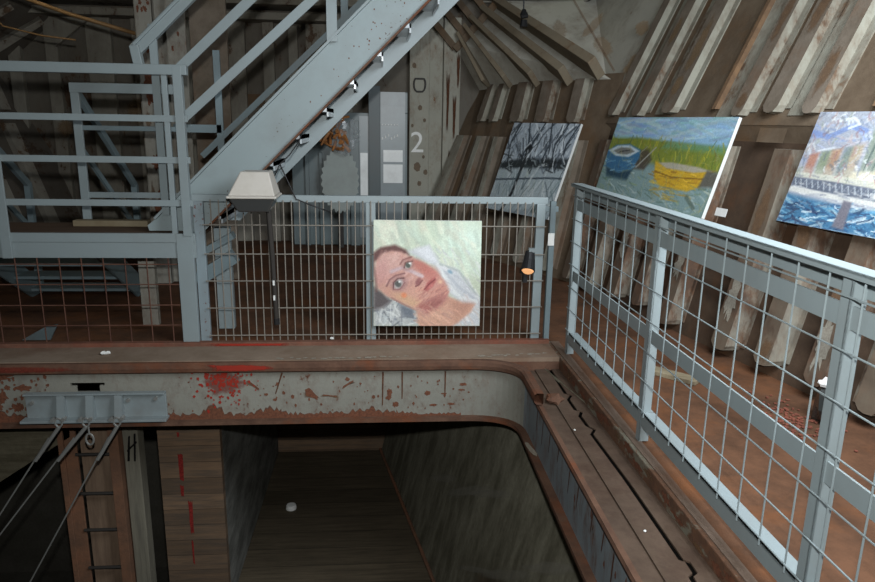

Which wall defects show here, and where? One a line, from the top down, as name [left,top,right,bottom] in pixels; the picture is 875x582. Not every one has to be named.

spalling [72,383,105,391]
peeling [305,381,354,400]
spalling [0,428,95,573]
spalling [143,426,168,568]